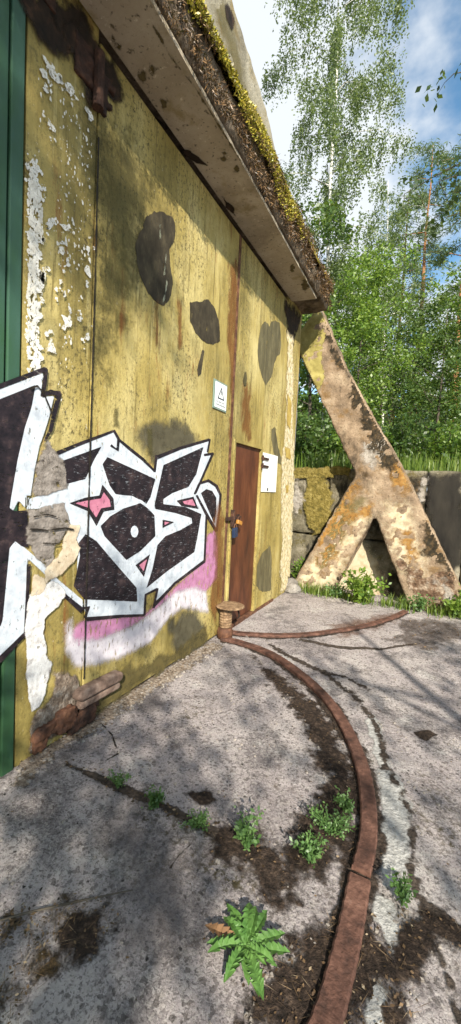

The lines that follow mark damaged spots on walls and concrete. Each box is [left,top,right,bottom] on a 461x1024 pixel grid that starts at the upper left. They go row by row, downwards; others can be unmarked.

corrosion [51,12,124,102]
corrosion [82,78,93,109]
peeling [24,55,95,381]
corrosion [227,262,251,440]
peeling [11,440,224,788]